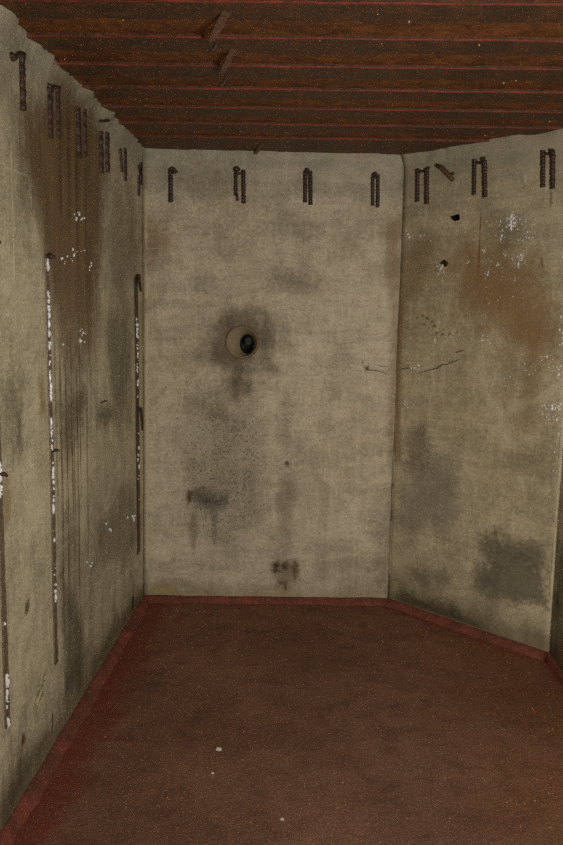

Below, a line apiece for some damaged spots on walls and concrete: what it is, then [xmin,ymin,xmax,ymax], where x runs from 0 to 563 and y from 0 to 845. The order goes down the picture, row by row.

rust [25,84,102,363]
leakage [495,213,536,241]
crack [362,350,464,375]
rust [60,367,89,591]
leakage [475,532,547,604]